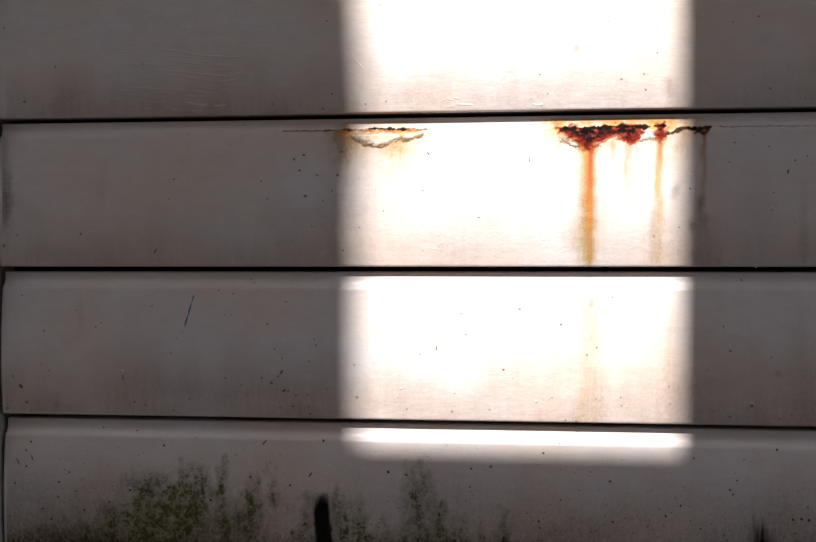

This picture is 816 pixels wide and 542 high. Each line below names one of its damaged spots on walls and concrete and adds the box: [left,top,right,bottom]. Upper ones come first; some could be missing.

corrosion [283,124,427,156]
peeling [351,131,424,148]
corrosion [542,118,725,263]
water stain [314,497,333,542]